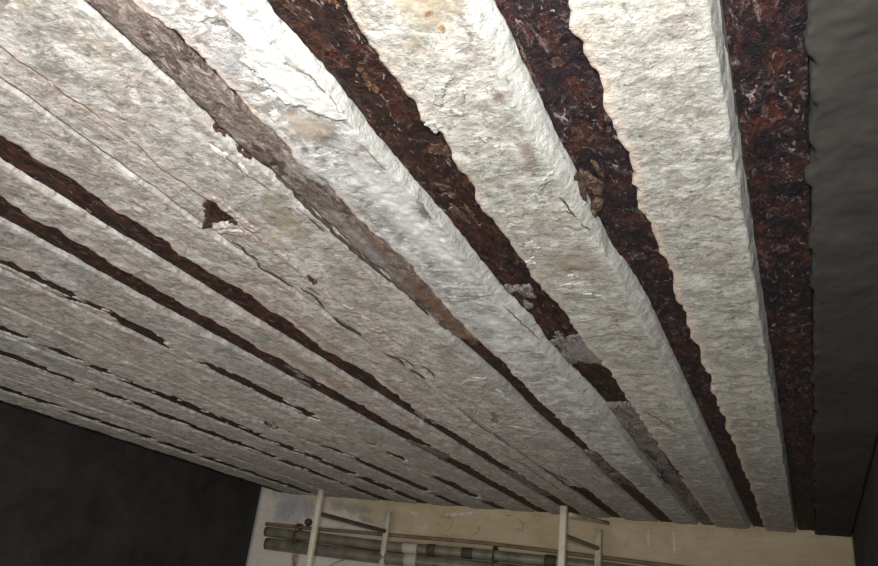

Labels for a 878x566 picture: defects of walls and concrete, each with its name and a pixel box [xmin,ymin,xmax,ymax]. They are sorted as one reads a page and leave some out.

peeling [193,0,347,121]
corrosion [518,43,533,76]
corrosion [356,67,379,94]
peeling [424,75,467,134]
spalling [209,144,252,175]
corrosion [428,142,452,158]
spalling [574,159,605,217]
spalling [202,196,259,236]
spalling [416,201,431,223]
peeling [521,240,540,269]
spalling [294,265,333,300]